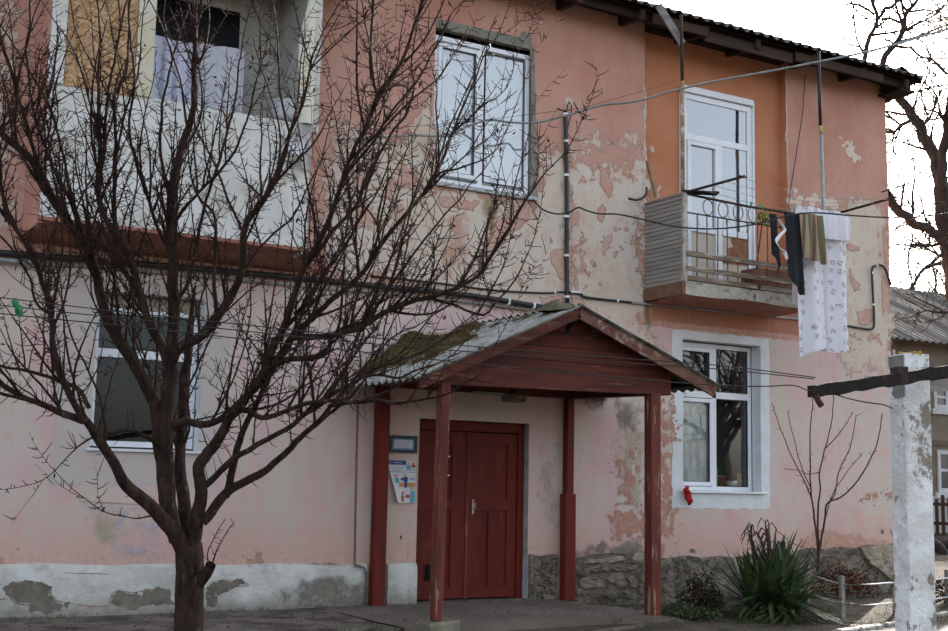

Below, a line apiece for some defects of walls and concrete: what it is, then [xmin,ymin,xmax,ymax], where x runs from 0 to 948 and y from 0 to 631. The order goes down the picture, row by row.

peeling [0,0,33,230]
peeling [319,87,668,353]
peeling [836,194,904,378]
peeling [892,385,904,397]
peeling [608,446,644,551]
spalling [3,580,70,615]
spalling [109,587,175,610]
spalling [205,578,248,607]